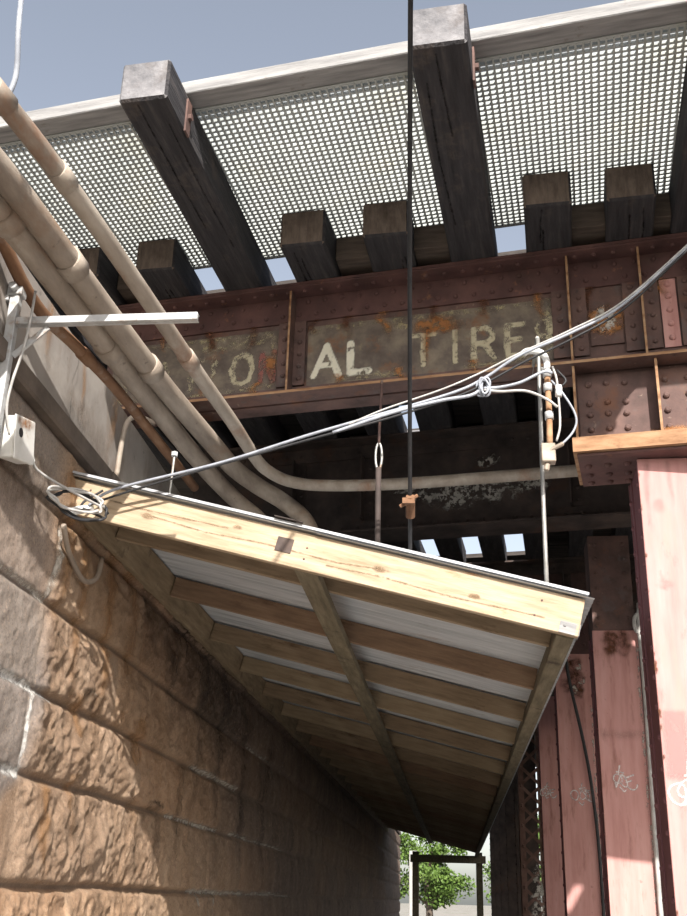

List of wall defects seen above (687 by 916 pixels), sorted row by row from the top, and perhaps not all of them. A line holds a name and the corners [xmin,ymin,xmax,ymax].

corrosion [585,287,622,333]
peeling [395,480,548,509]
corrosion [604,631,630,654]